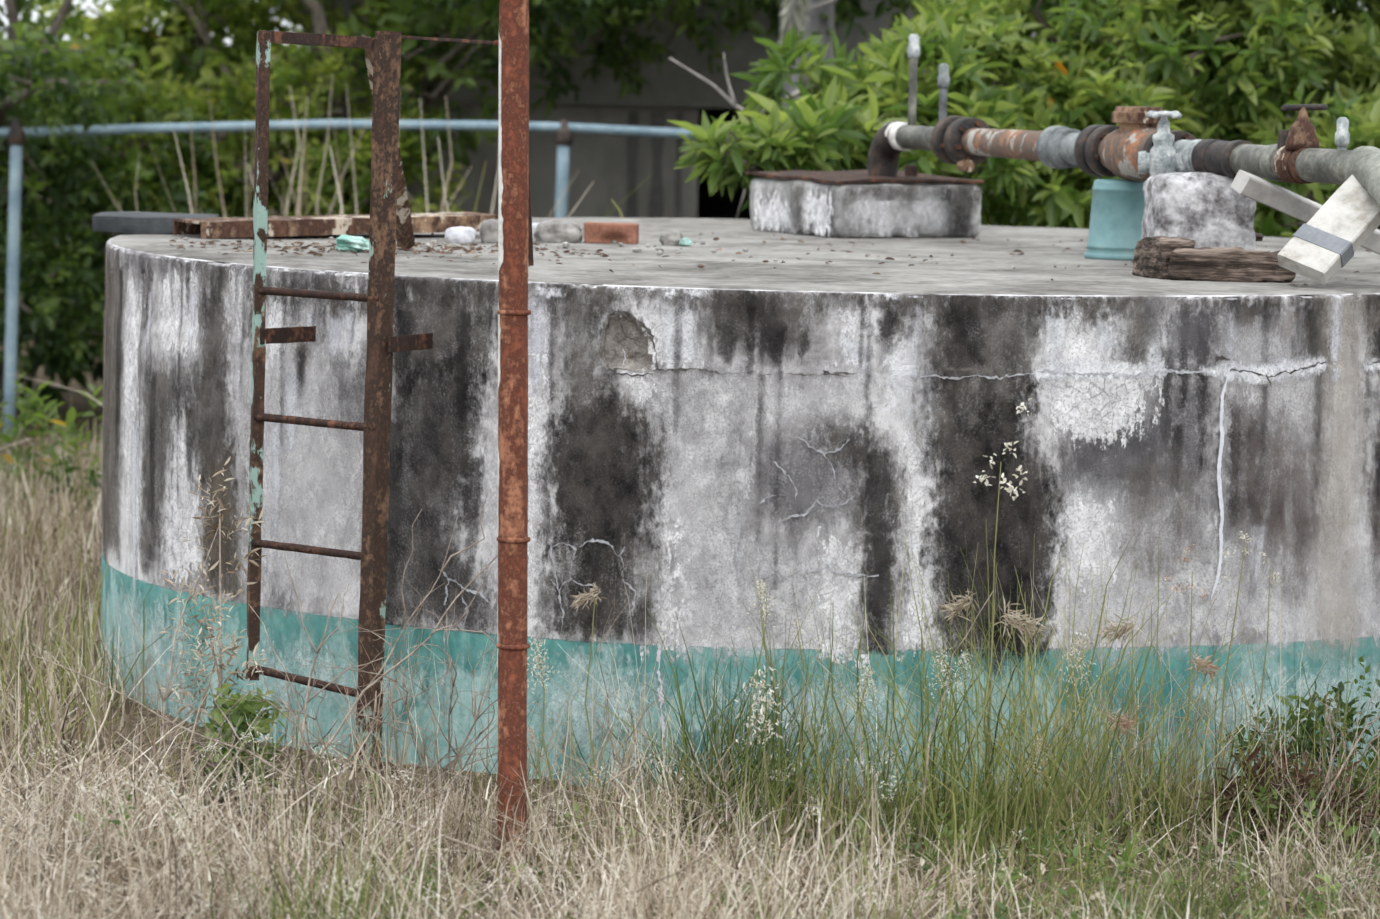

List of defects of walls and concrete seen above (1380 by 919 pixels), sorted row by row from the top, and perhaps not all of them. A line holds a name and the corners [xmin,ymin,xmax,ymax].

water stain [101,244,368,592]
water stain [385,276,499,634]
peeling [541,286,947,754]
water stain [528,283,1380,663]
crack [911,355,1327,602]
crack [1363,358,1380,372]